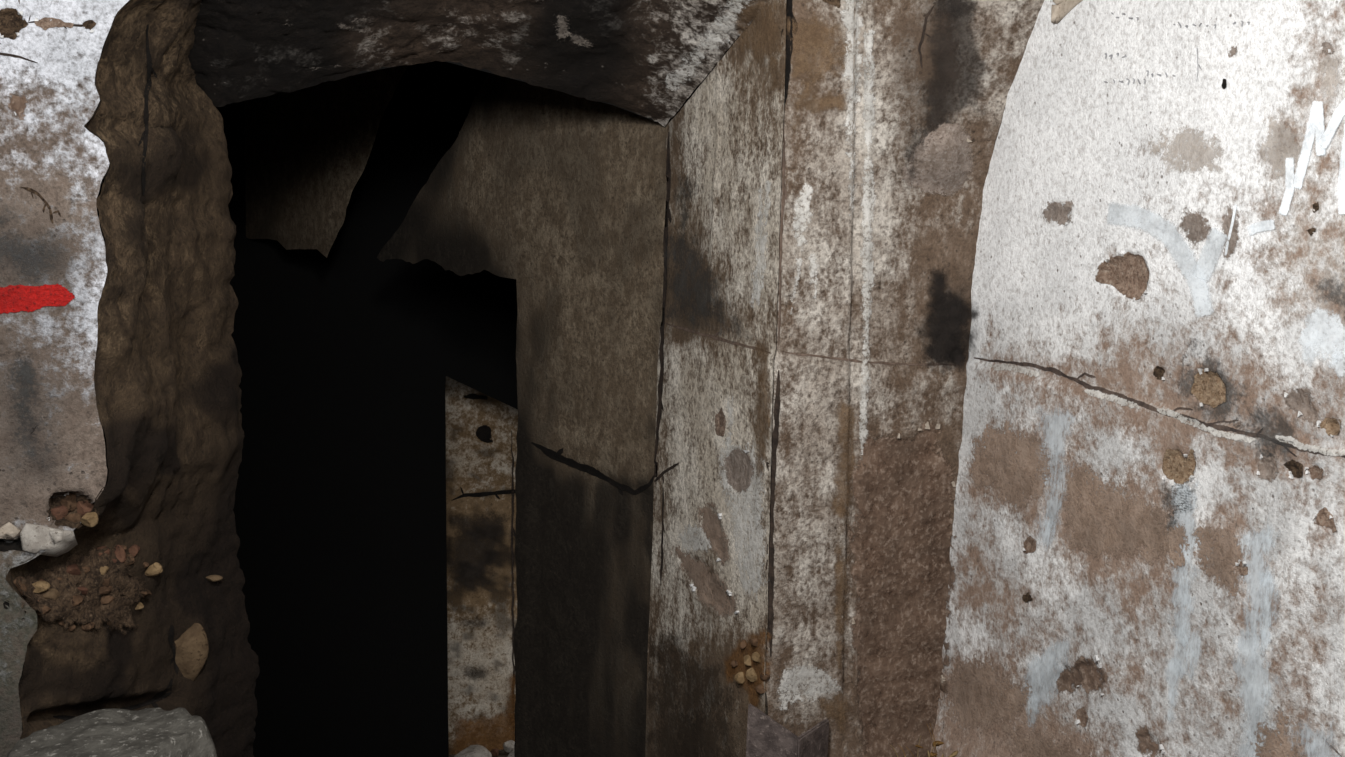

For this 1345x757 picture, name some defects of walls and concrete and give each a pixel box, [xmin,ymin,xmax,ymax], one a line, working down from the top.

spalling [0,8,96,40]
water stain [930,271,947,300]
spalling [1093,252,1149,301]
crack [451,0,1345,713]
water stain [951,348,966,368]
peeling [671,502,739,618]